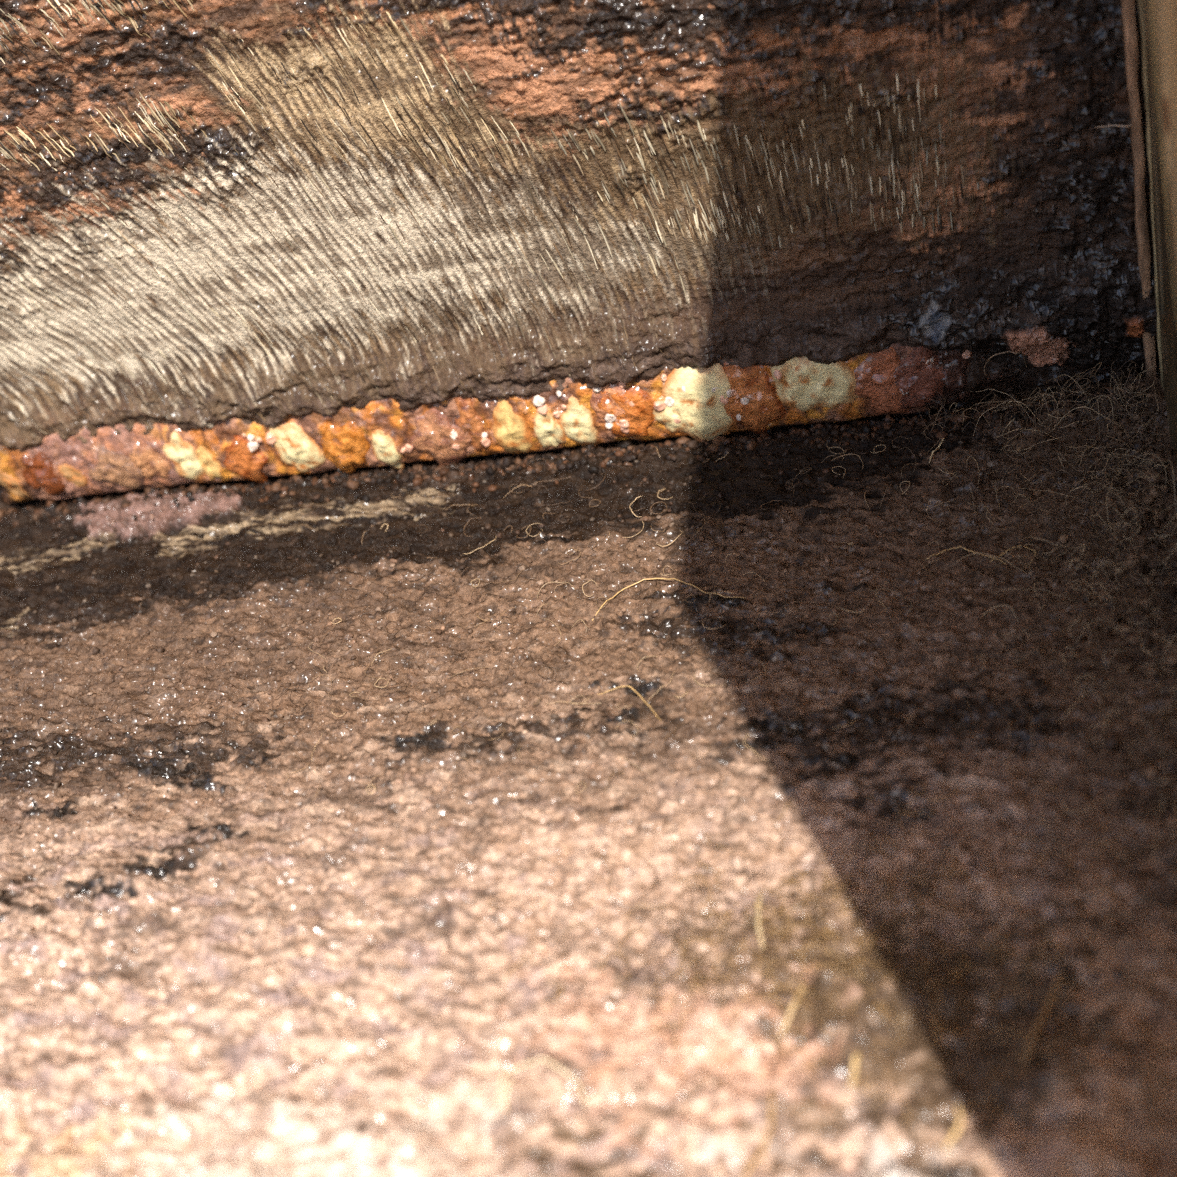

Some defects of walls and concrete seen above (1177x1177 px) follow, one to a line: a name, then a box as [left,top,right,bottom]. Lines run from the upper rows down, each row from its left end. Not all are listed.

leakage [0,0,269,282]
peeling [0,0,1025,451]
corrosion [0,323,1138,504]
leakage [279,0,1177,465]
leakage [0,414,1014,942]
leakage [0,578,1177,1177]